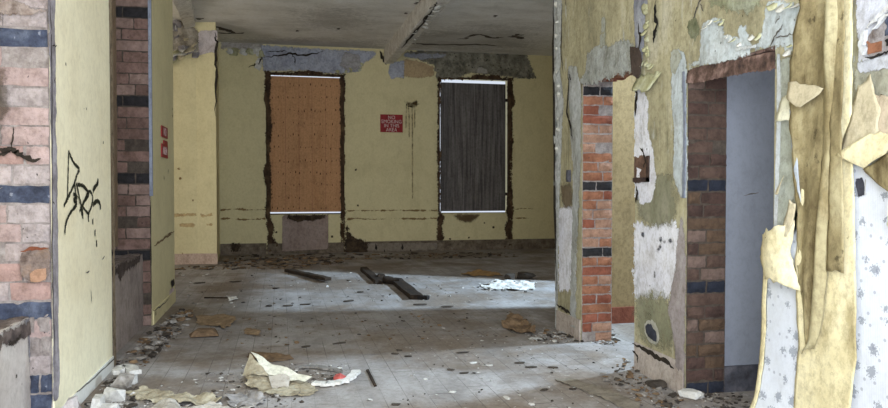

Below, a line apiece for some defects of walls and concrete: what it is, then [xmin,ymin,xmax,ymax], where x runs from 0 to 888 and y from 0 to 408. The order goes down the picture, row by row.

crack [0,6,57,341]
flaking render [0,0,66,408]
flaking render [173,19,376,254]
crack [249,50,323,67]
flaking render [367,4,536,252]
crack [403,2,524,46]
crack [552,0,572,279]
flaking render [553,0,800,394]
flaking render [856,0,888,62]
crack [632,343,674,369]